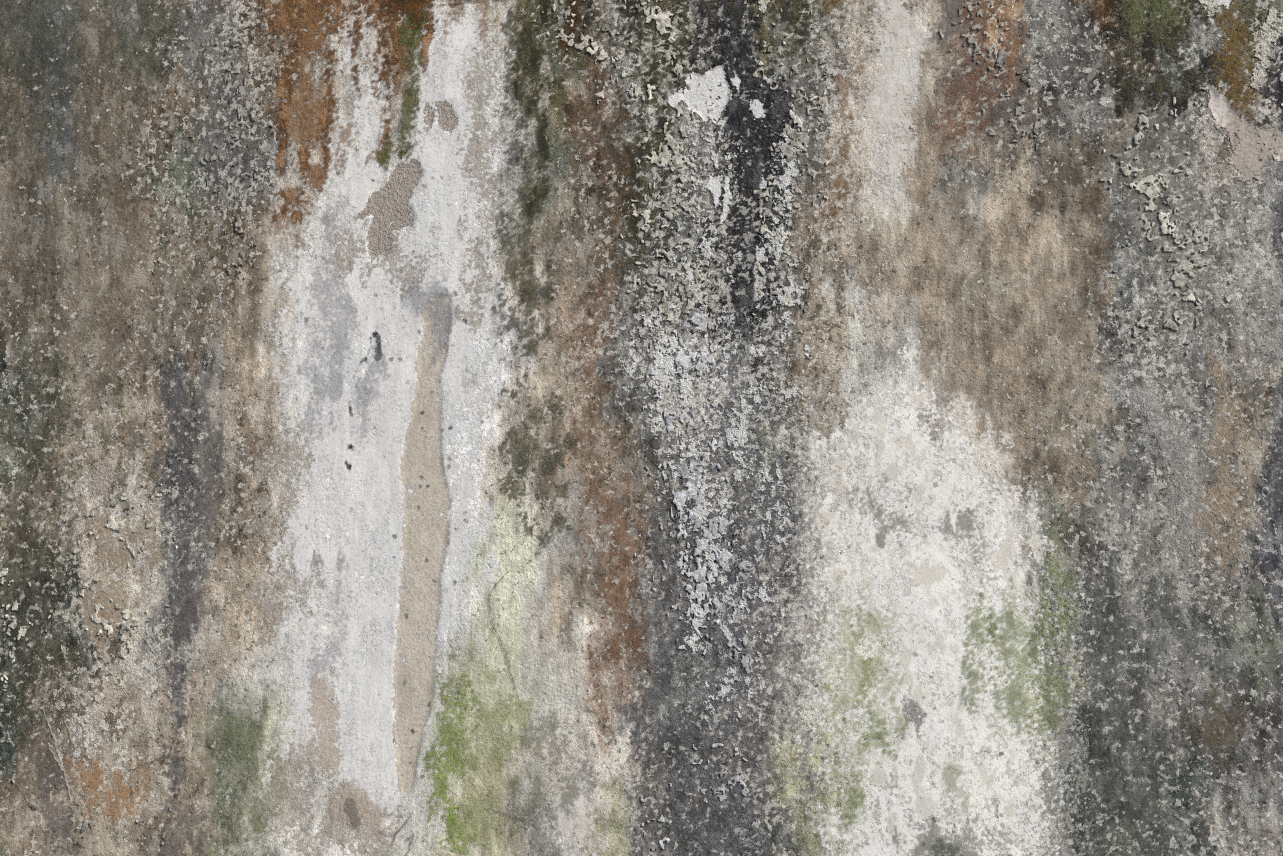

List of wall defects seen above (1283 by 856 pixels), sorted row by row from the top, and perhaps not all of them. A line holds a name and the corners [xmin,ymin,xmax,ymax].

rust [248,0,472,224]
peeling [392,292,453,796]
rust [553,0,585,65]
peeling [533,0,835,681]
water stain [712,373,805,663]
peeling [1100,97,1242,577]